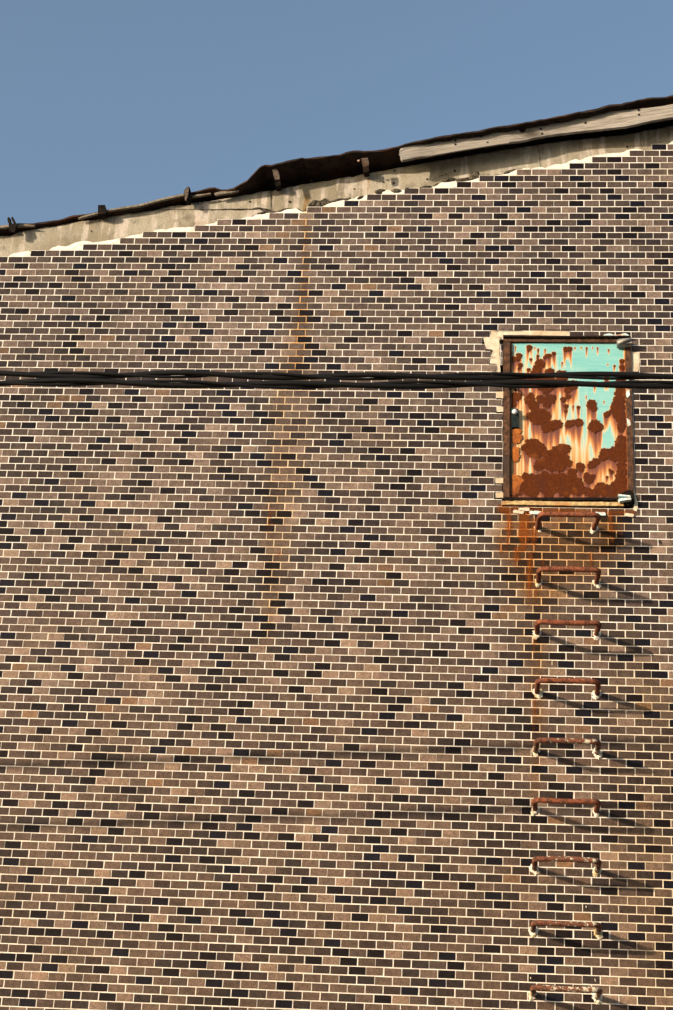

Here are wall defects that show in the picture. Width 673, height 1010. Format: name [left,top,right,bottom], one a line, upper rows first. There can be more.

corrosion [509,345,628,515]